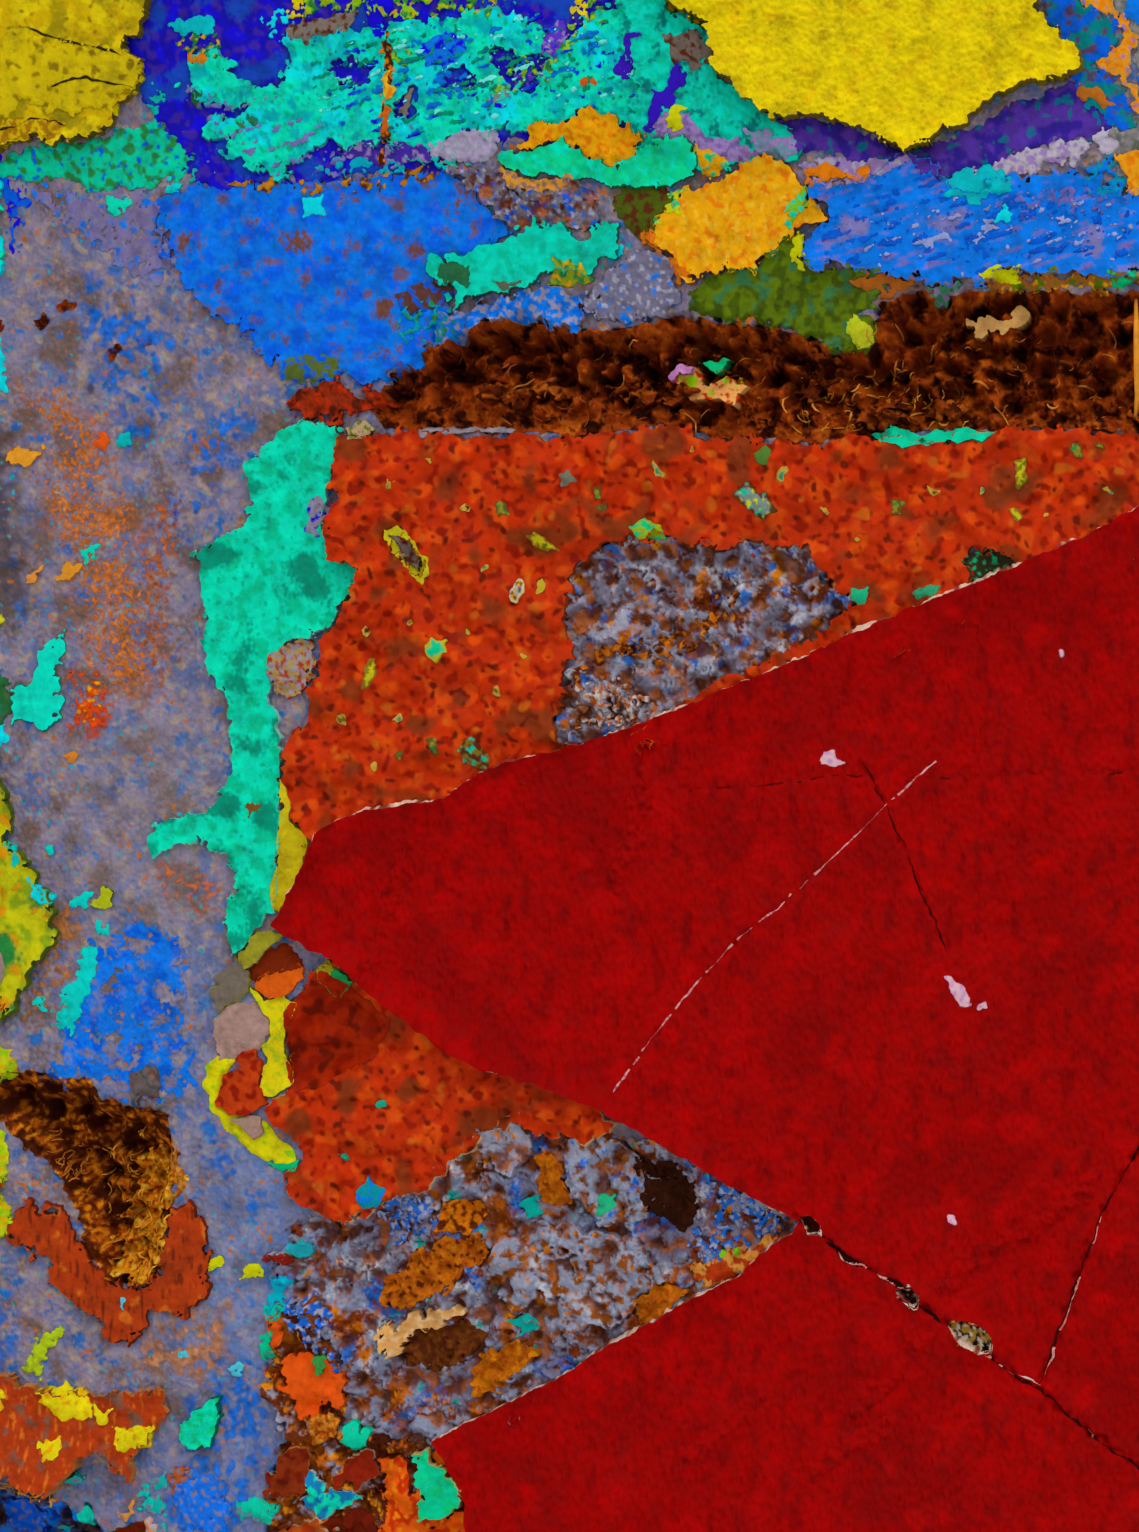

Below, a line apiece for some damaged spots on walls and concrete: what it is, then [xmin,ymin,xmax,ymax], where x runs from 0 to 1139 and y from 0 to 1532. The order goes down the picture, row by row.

crack [690,762,950,950]
crack [819,1146,1139,1470]